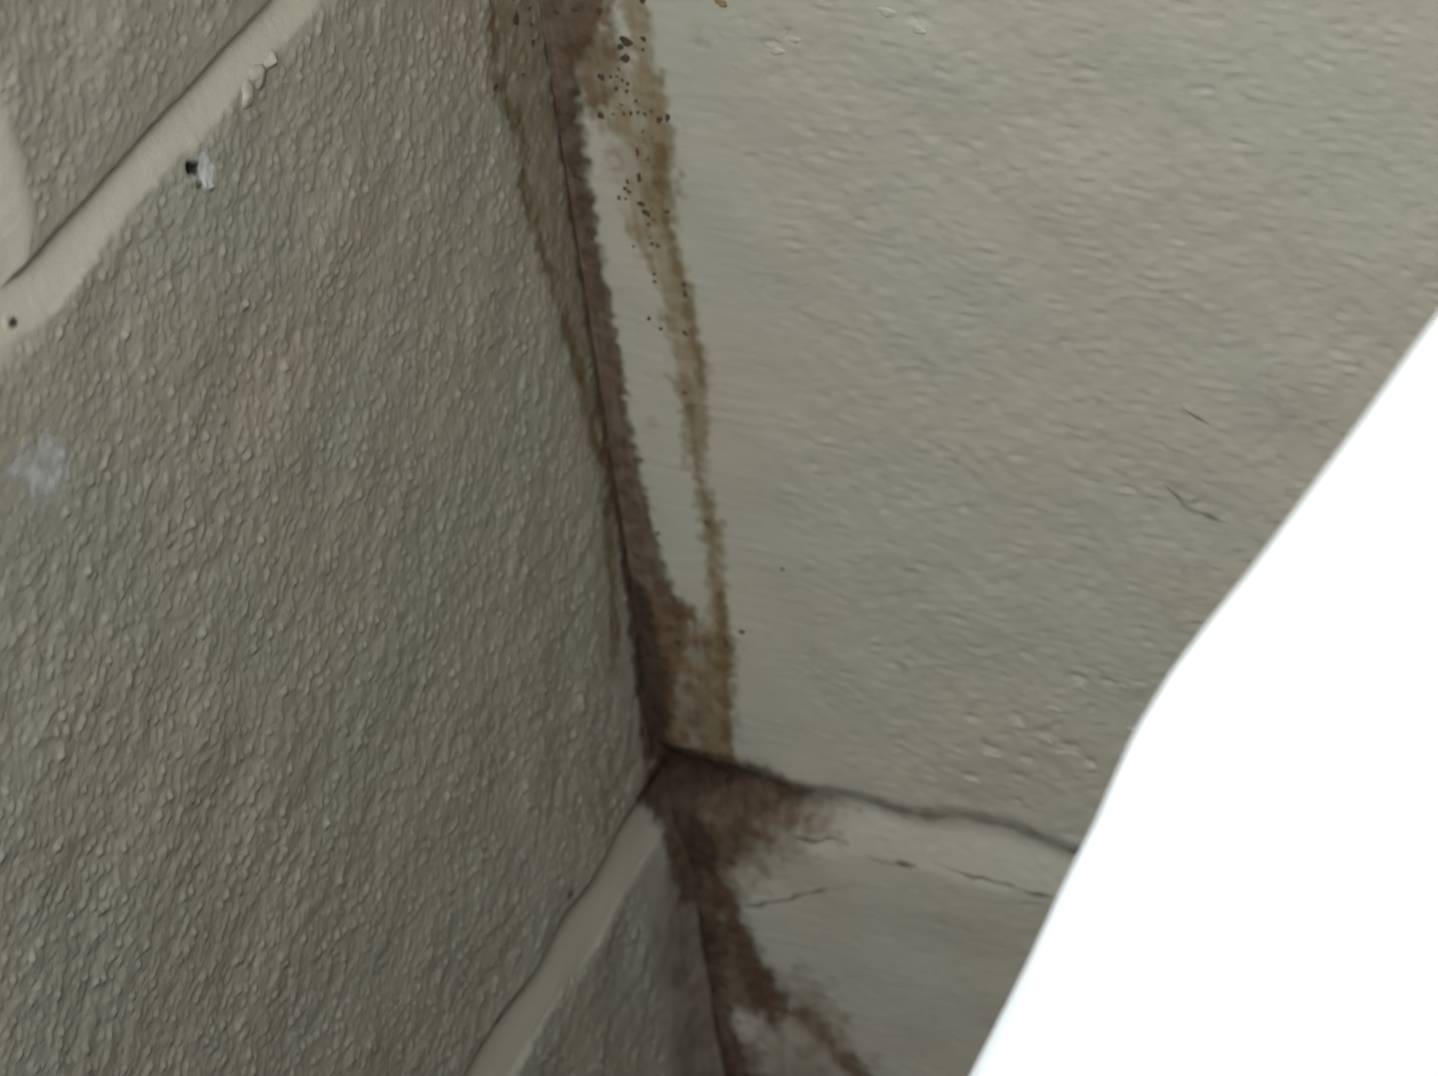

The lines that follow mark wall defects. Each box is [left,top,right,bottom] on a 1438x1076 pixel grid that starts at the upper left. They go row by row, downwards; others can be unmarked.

leakage [573,0,707,469]
leakage [698,492,721,552]
leakage [651,578,745,769]